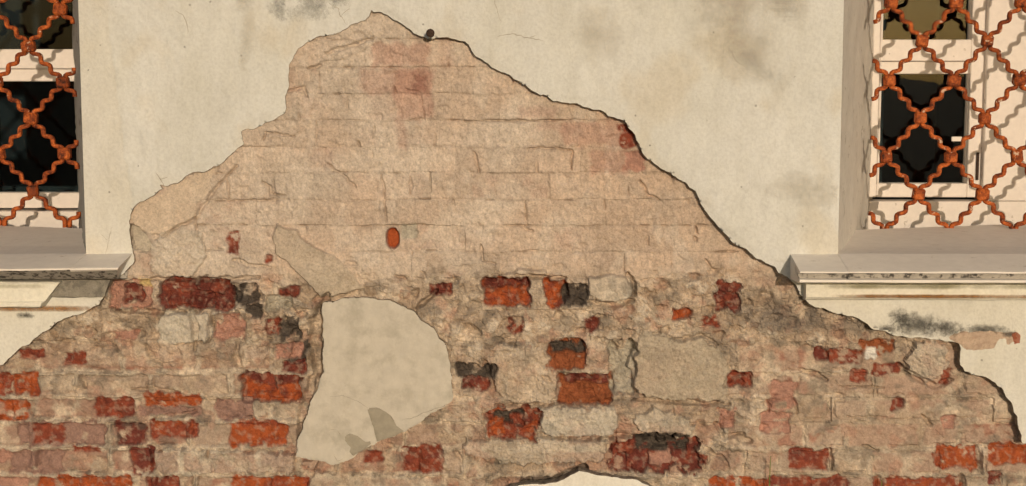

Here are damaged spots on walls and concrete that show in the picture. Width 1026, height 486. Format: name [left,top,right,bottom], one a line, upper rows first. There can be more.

peeling [273,223,364,298]
spalling [713,279,744,315]
spalling [11,370,41,397]
spalling [455,361,499,380]
spalling [556,371,614,412]
spalling [0,398,56,463]
spalling [31,421,67,445]
spalling [51,418,109,448]
spalling [7,448,65,476]
spalling [0,461,134,486]
spalling [400,443,444,475]
spalling [987,441,1026,468]